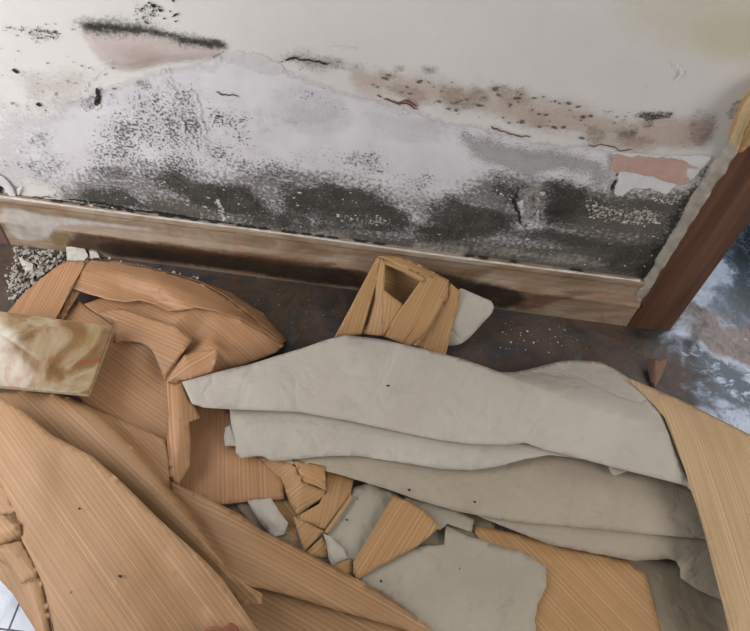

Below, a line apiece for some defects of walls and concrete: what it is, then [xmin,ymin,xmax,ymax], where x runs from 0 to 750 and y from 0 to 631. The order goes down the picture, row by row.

crack [281,57,357,70]
damp [355,69,707,150]
peeling [0,50,711,270]
damp [55,82,693,278]
damp [4,209,367,288]
damp [435,272,524,308]